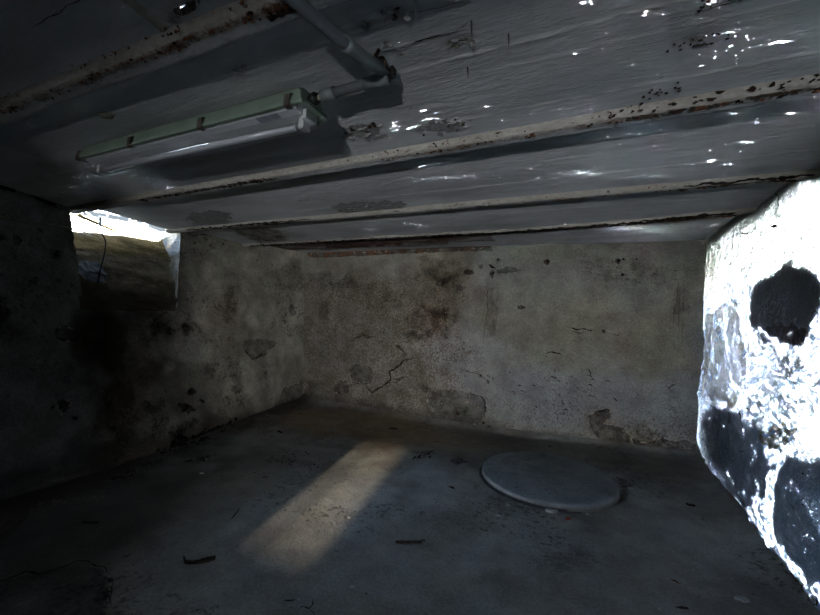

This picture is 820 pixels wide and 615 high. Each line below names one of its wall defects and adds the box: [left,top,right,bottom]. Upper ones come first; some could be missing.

spalling [665,32,730,53]
rust [36,25,196,102]
peeling [343,122,388,141]
peeling [406,117,471,136]
rust [414,131,536,157]
peeling [332,200,407,213]
rust [405,305,458,340]
crack [365,344,415,396]
peeling [700,300,820,453]
spalling [588,409,697,449]